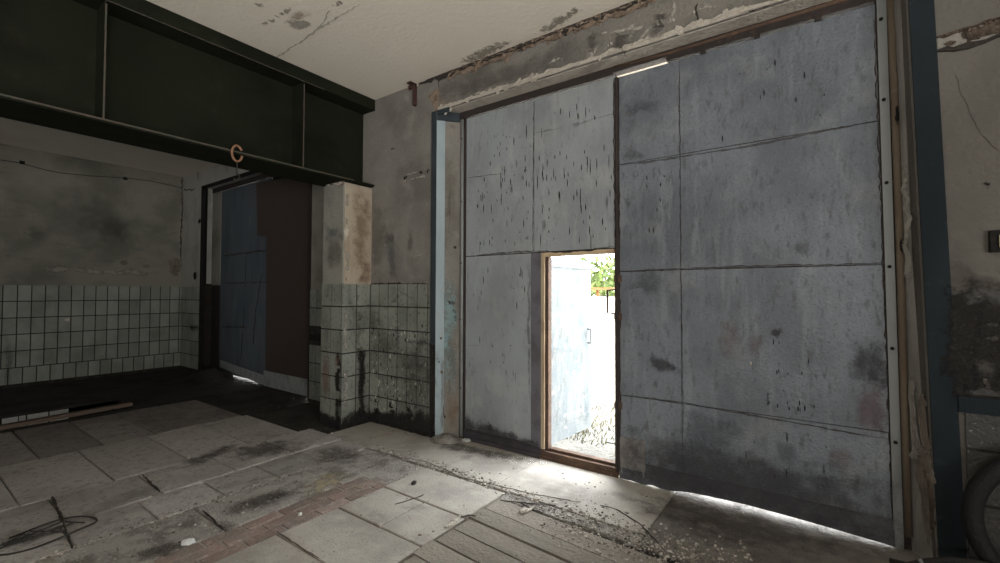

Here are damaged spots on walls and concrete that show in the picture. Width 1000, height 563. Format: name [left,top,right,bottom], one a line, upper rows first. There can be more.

crack [277,4,360,58]
spalling [407,0,784,115]
spalling [936,17,1000,53]